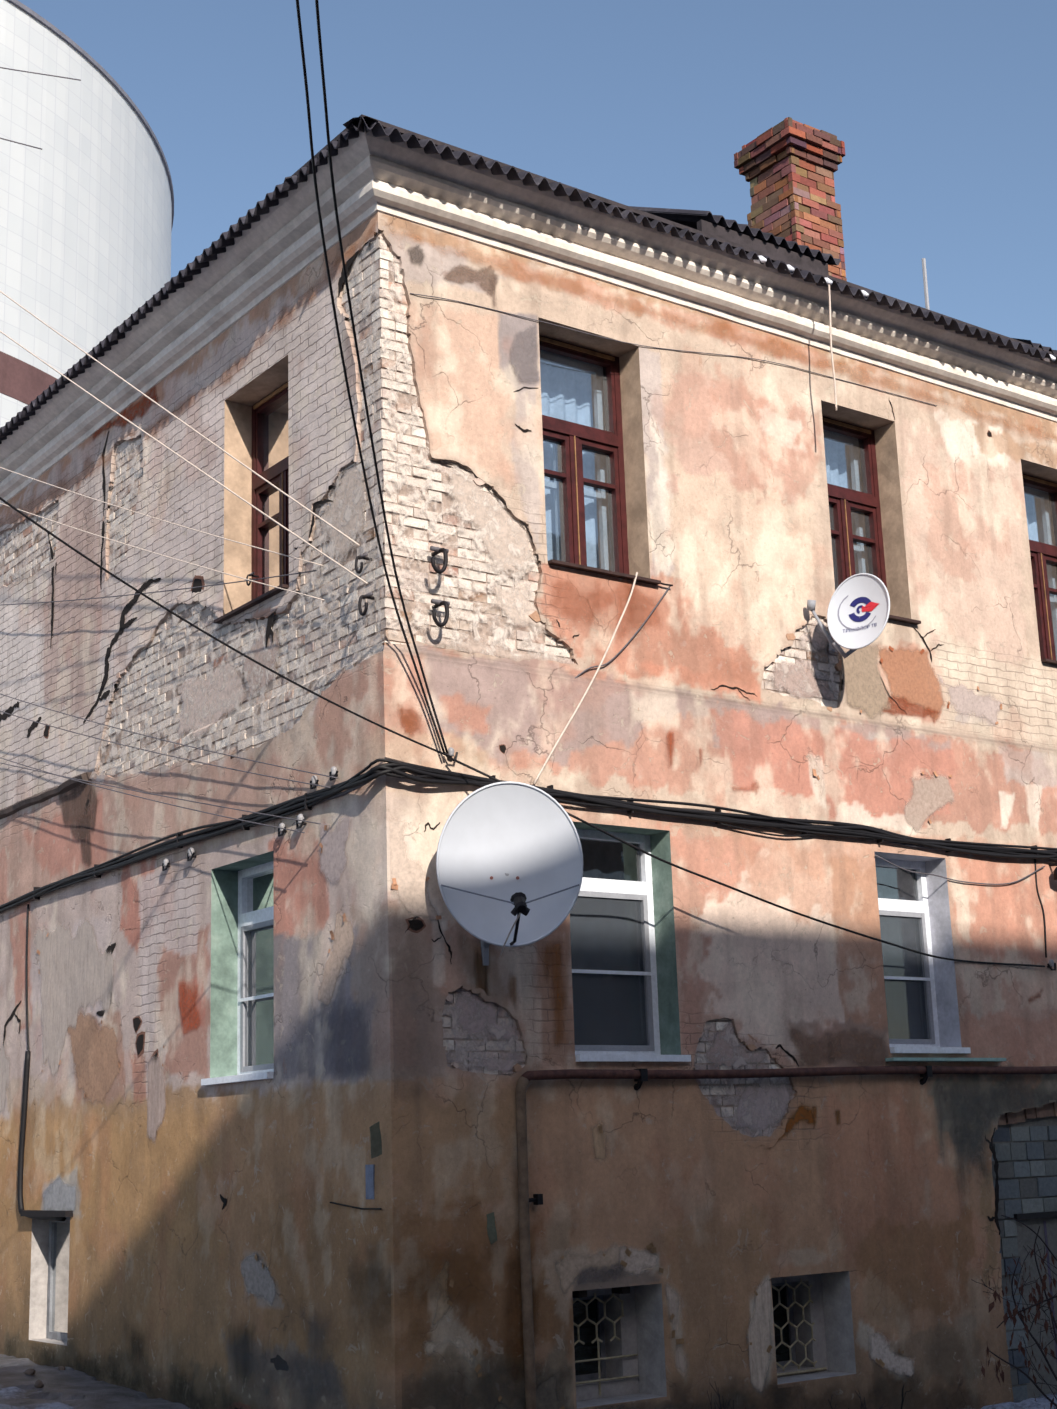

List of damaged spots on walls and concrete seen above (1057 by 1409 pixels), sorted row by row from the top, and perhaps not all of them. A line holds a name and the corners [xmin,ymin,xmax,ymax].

flaking render [97,232,575,778]
crack [47,533,57,639]
crack [83,431,161,724]
crack [0,701,41,738]
flaking render [761,617,950,719]
peeling [68,1012,120,1103]
peeling [133,1016,166,1139]
flaking render [442,988,526,1076]
flaking render [692,1018,796,1138]